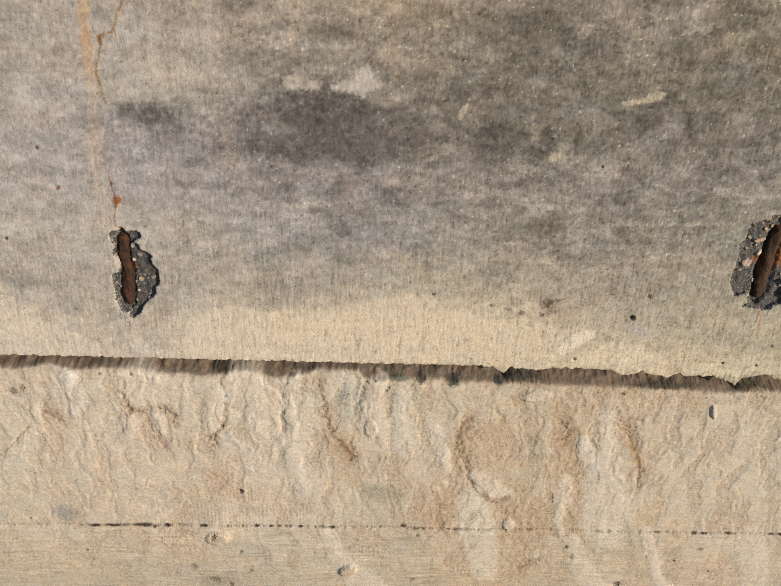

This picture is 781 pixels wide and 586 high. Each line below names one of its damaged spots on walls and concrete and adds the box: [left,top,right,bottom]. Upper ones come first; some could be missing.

crack [93,0,125,105]
crack [107,171,123,230]
spalling [109,228,160,318]
spalling [730,215,781,311]